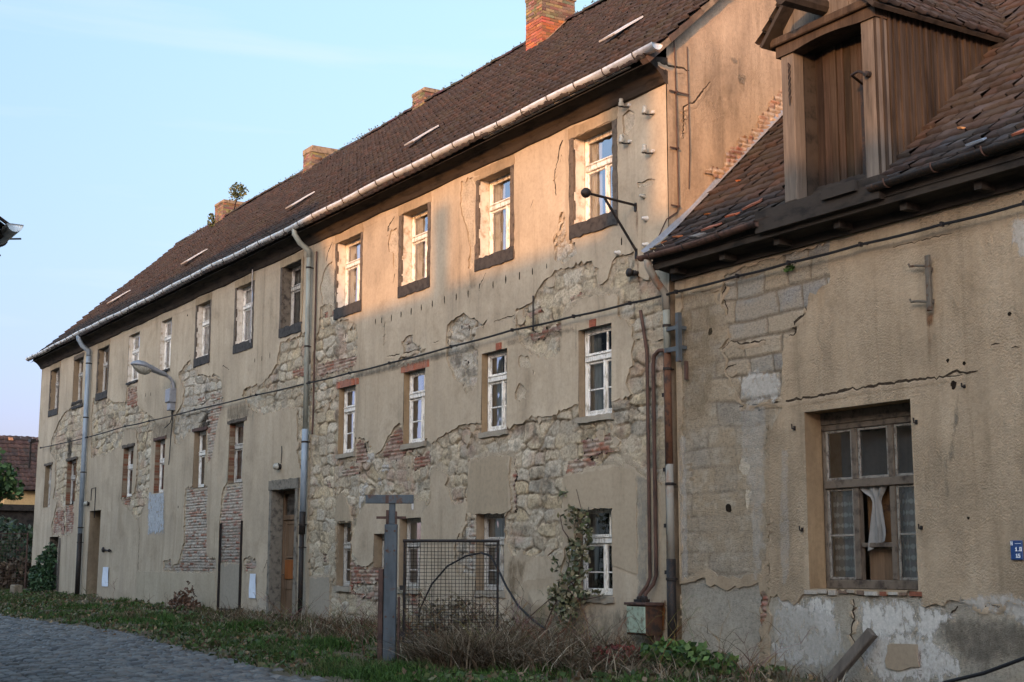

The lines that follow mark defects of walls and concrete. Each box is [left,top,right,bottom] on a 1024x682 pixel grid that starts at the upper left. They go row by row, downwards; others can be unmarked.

crack [657,60,712,138]
spalling [50,386,156,537]
spalling [173,360,223,463]
spalling [242,212,665,624]
spalling [680,240,1024,682]
crack [739,343,1020,452]
spalling [163,484,216,573]